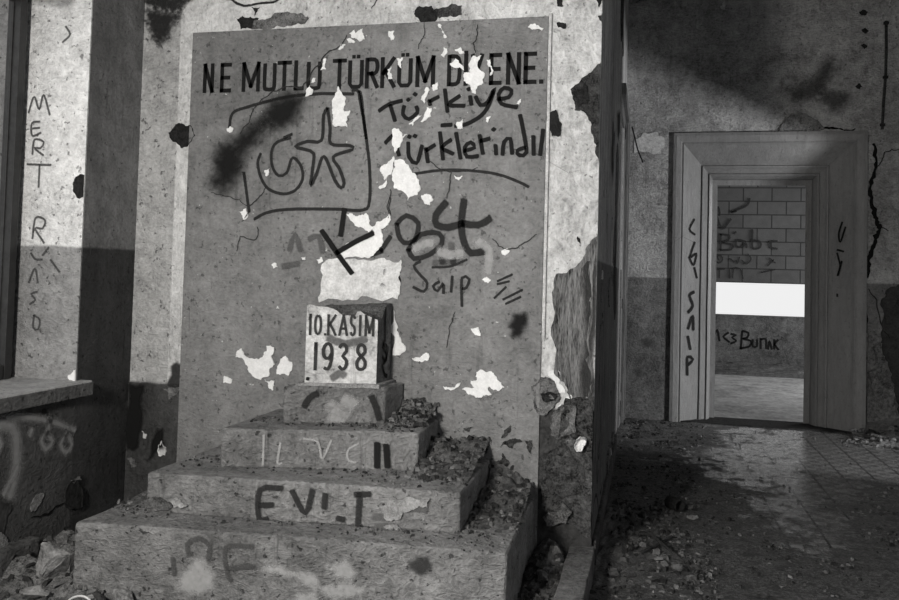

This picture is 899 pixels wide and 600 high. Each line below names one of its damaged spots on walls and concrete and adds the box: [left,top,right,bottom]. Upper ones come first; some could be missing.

crack [231,0,279,8]
peeling [379,82,439,205]
spalling [546,110,562,137]
spalling [571,62,601,159]
crack [866,143,899,360]
peeling [236,346,293,390]
peeling [443,370,504,401]
spalling [500,237,597,539]
spalling [866,285,899,422]